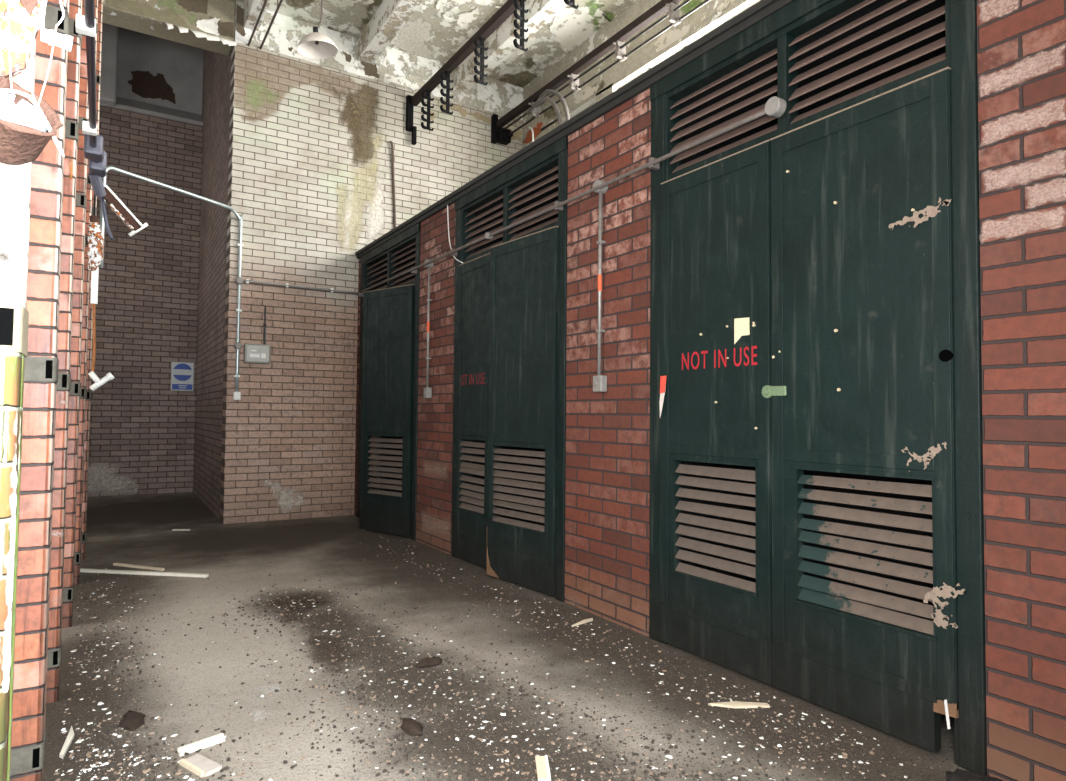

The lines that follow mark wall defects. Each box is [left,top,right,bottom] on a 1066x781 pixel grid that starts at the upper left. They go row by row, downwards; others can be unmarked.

peeling [259,32,297,56]
peeling [334,42,419,89]
peeling [436,0,507,28]
peeling [499,36,541,65]
peeling [550,7,594,51]
peeling [574,85,599,104]
water stain [341,85,378,162]
water stain [343,181,384,248]